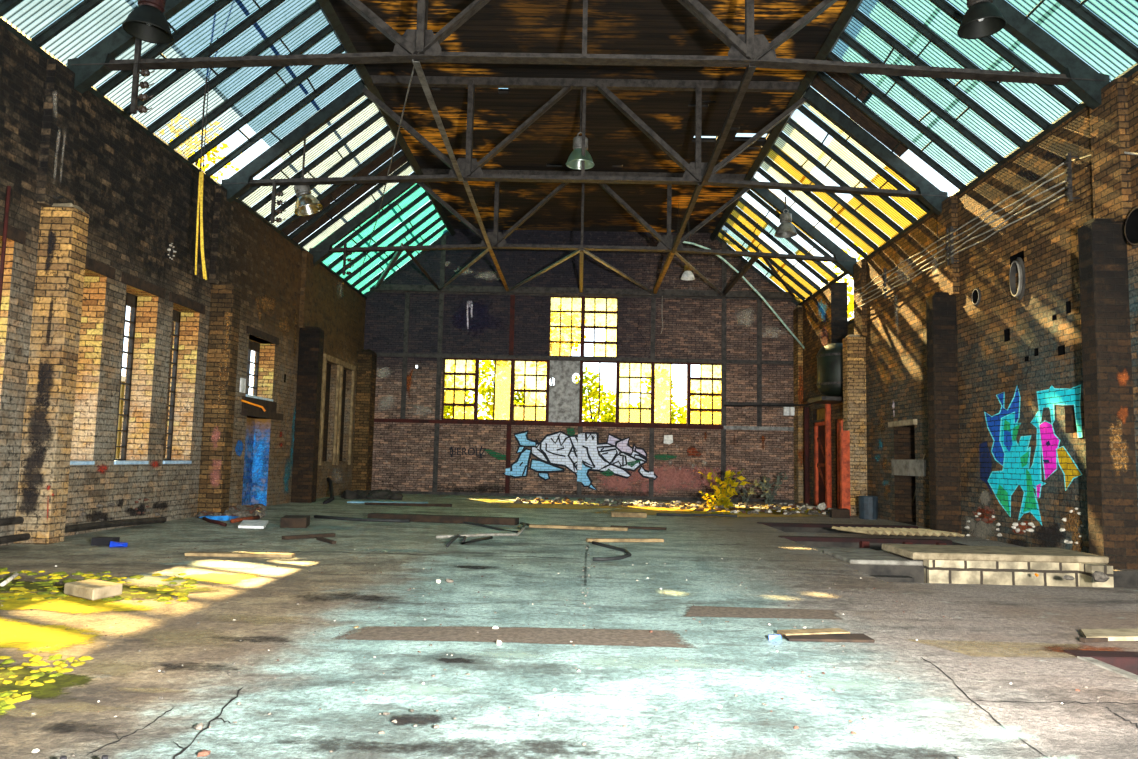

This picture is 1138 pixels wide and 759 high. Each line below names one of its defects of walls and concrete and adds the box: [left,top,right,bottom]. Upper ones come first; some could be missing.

damp [45,230,56,275]
damp [46,295,54,346]
damp [18,360,54,514]
crack [86,707,174,756]
crack [173,687,243,759]
crack [922,658,1138,759]